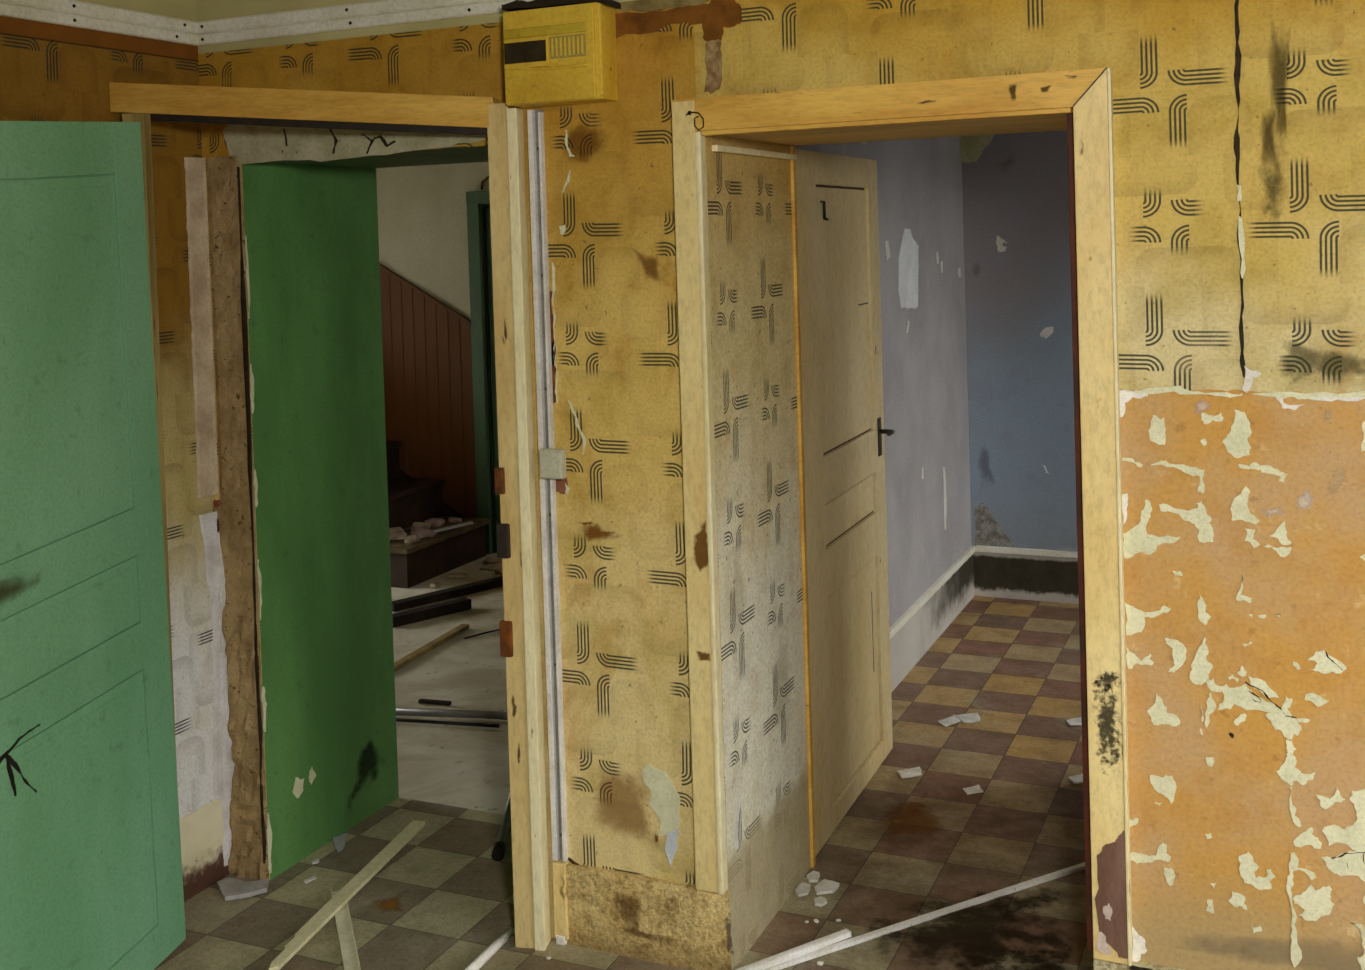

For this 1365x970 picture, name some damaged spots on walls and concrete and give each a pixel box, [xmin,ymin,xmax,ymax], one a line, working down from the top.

peeling [885,228,919,333]
peeling [996,235,1007,252]
peeling [1120,366,1365,482]
peeling [1122,458,1214,559]
peeling [1230,487,1292,558]
peeling [1125,603,1171,669]
peeling [1236,573,1281,619]
leakage [1094,672,1121,765]
peeling [1147,693,1180,727]
peeling [642,764,681,867]
peeling [1150,775,1176,806]
peeling [1165,593,1365,970]